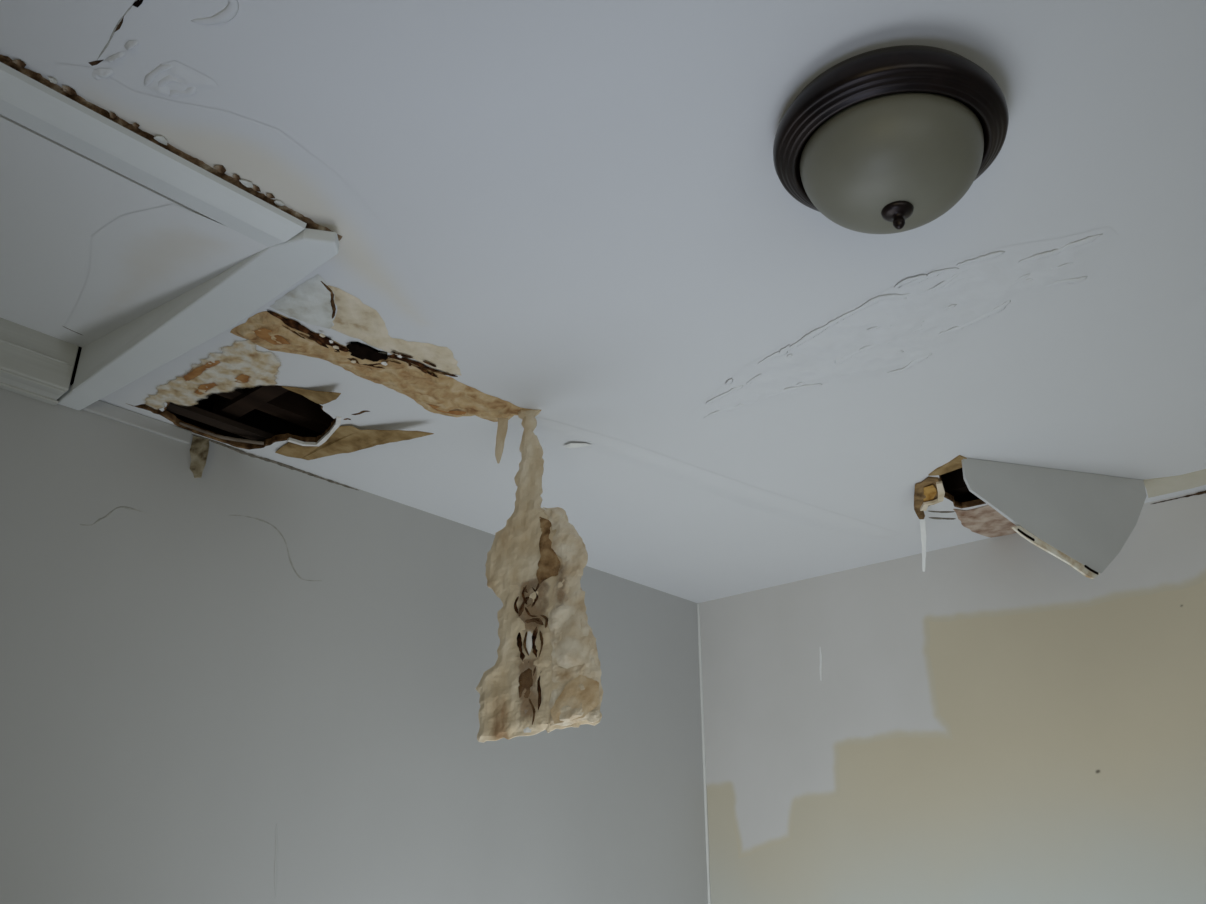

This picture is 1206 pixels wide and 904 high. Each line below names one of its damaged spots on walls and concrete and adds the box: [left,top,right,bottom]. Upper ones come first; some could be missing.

crack [89,0,143,80]
flaking render [270,274,335,329]
spalling [128,402,336,478]
peeling [698,469,1206,858]